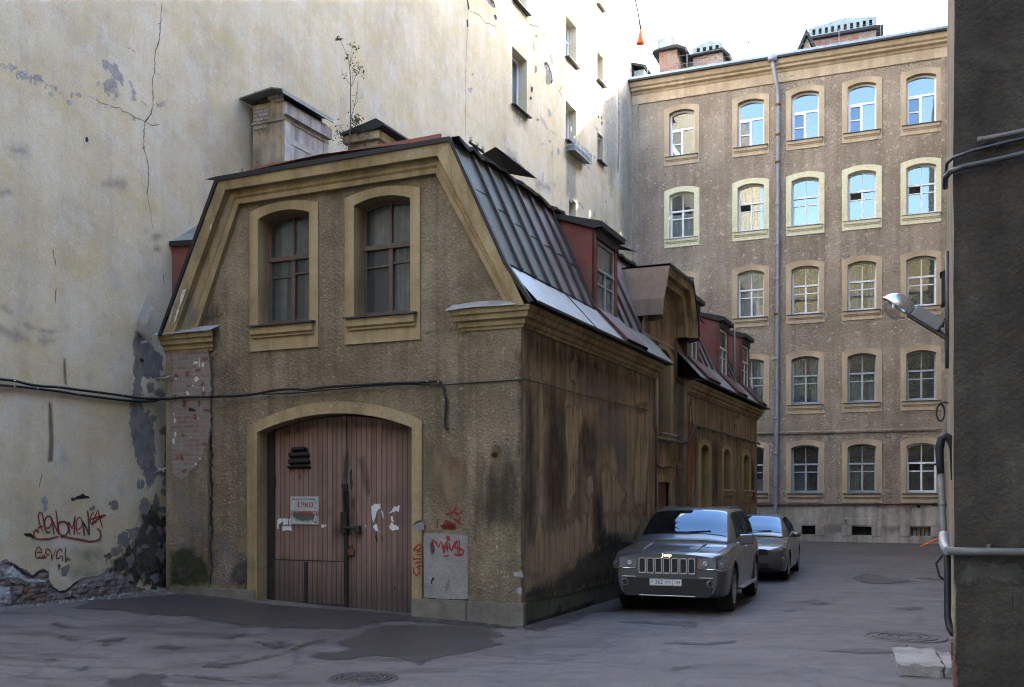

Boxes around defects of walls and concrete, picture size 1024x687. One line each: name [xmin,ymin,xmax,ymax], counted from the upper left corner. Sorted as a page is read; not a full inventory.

flaking render [97,60,147,106]
crack [92,6,162,226]
flaking render [129,330,212,512]
leakage [525,369,649,599]
spalling [0,559,145,607]
leakage [523,598,628,630]